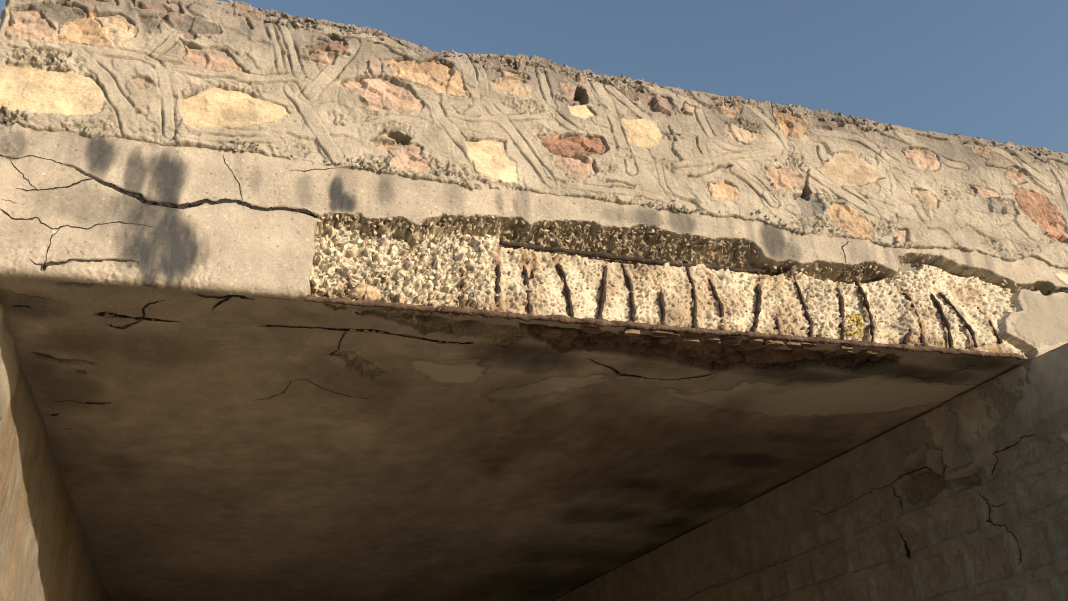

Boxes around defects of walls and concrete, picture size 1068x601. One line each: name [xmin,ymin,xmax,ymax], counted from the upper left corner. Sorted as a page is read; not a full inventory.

water stain [89,137,112,170]
crack [0,154,317,270]
water stain [123,154,198,285]
crack [98,300,175,329]
crack [195,294,254,310]
spalling [306,209,1068,417]
crack [1045,286,1068,294]
crack [258,325,473,356]
crack [252,379,367,401]
crack [812,465,951,560]
crack [977,434,1035,564]